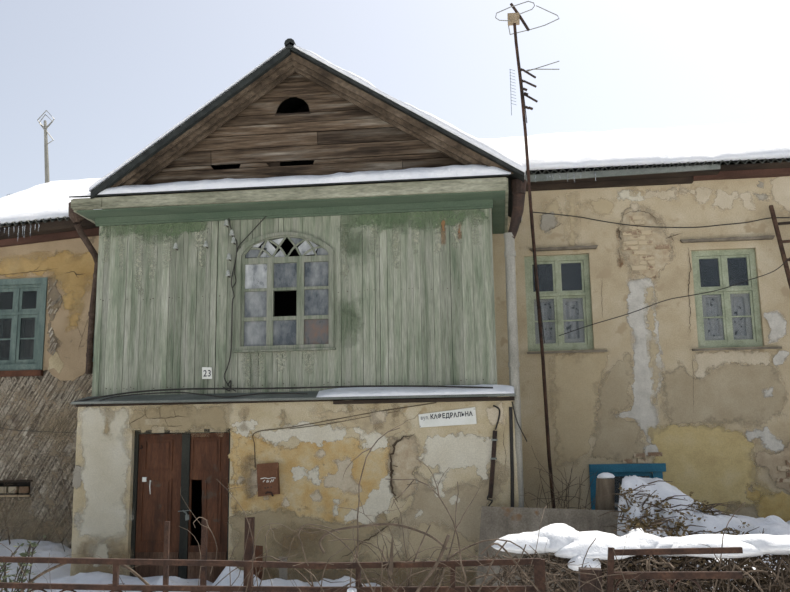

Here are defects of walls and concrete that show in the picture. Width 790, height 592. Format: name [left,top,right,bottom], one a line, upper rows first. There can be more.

spalling [617,187,756,278]
peeling [757,176,790,212]
peeling [0,250,95,355]
peeling [486,401,504,425]
damp [614,278,664,443]
peeling [664,311,790,522]
peeling [145,410,503,561]
crack [342,434,415,557]